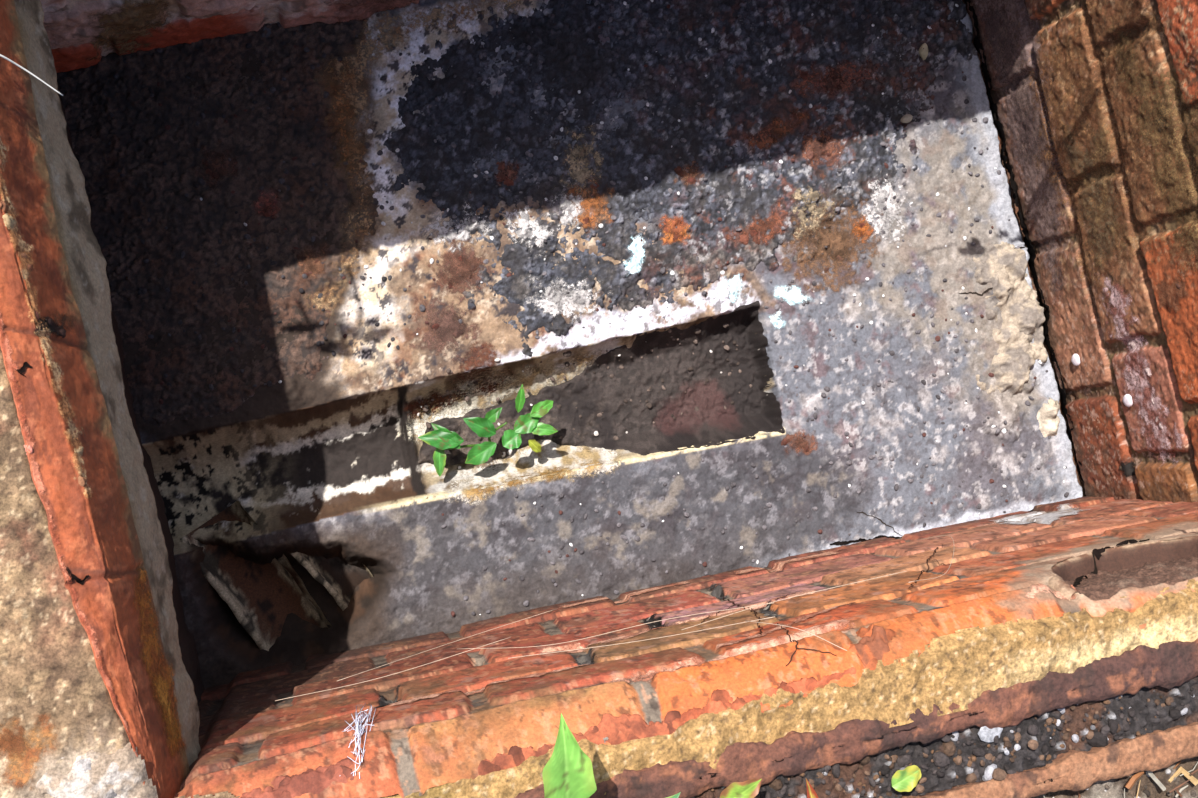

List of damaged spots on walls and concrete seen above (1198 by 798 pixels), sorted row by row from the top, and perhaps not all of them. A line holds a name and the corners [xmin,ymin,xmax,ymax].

leakage [311,0,521,309]
corrosion [568,178,614,229]
corrosion [659,215,691,245]
corrosion [674,160,704,185]
corrosion [747,108,843,178]
corrosion [726,189,883,292]
crack [909,544,946,588]
crack [697,593,837,666]